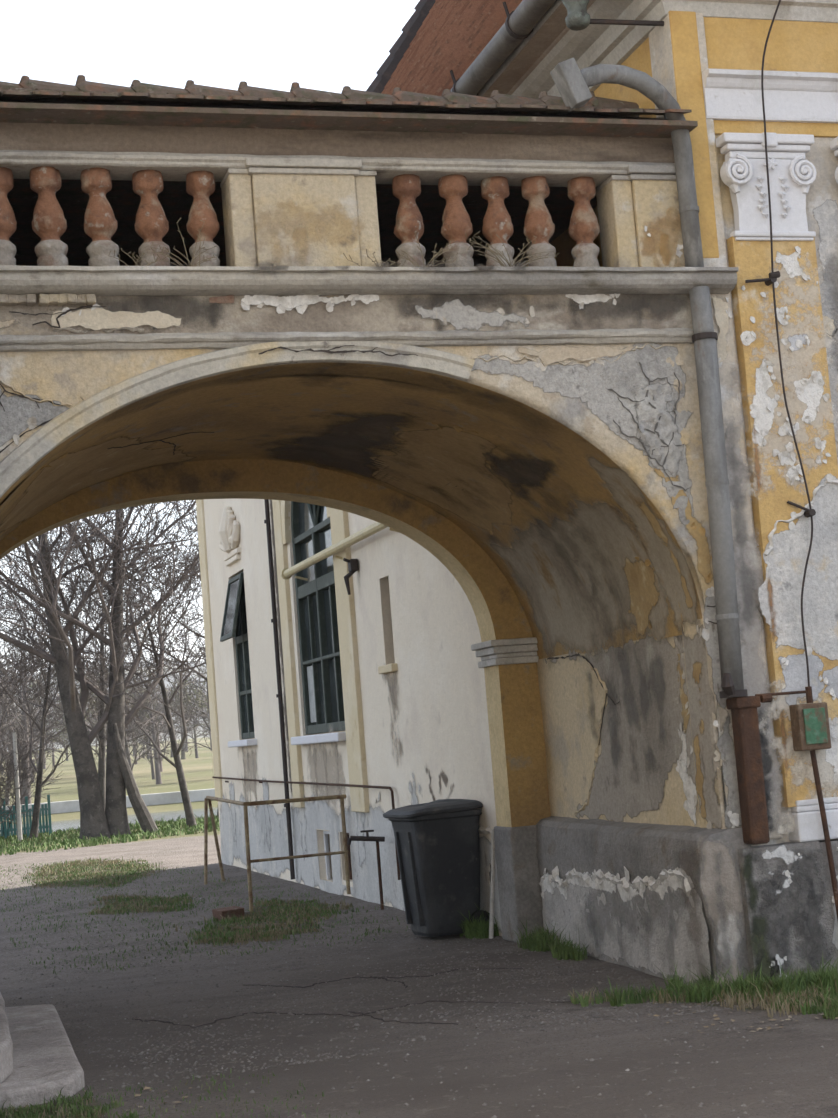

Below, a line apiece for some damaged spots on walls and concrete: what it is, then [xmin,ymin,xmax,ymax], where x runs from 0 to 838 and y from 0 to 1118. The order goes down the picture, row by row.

flaking render [0,293,181,334]
flaking render [209,294,380,314]
flaking render [415,299,535,331]
flaking render [565,293,620,309]
flaking render [0,379,71,446]
crack [108,432,214,455]
water stain [266,413,409,479]
flaking render [712,200,838,805]
flaking render [471,343,742,828]
flaking render [539,866,712,983]
crack [135,968,580,1028]